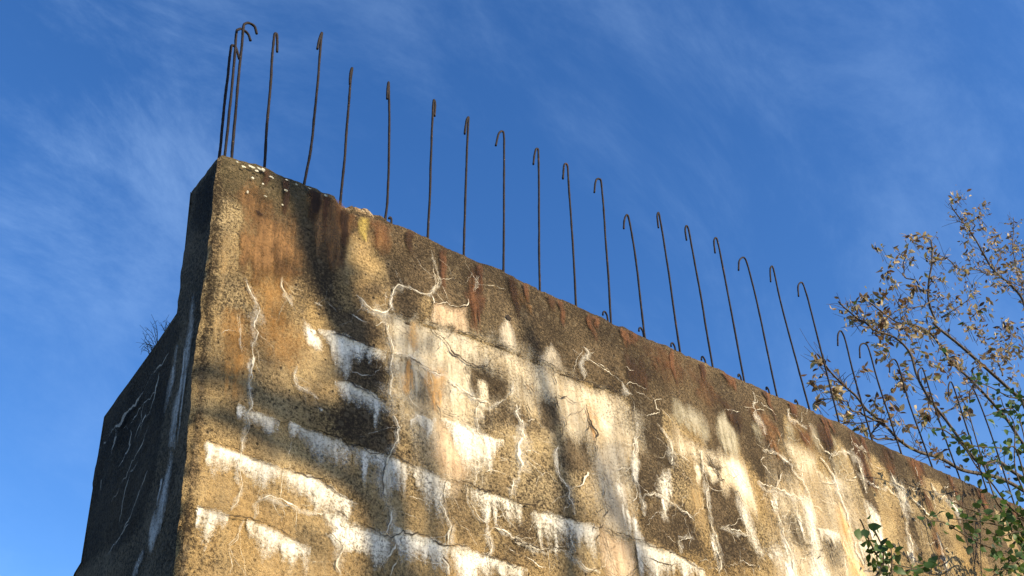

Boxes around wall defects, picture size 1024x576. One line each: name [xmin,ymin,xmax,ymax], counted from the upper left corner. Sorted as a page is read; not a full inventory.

corrosion [239,167,302,287]
corrosion [309,189,352,266]
crack [100,354,168,551]
damp [196,507,229,535]
damp [306,325,381,369]
damp [206,442,522,576]
damp [362,305,704,576]
crack [225,252,961,576]
corrosion [620,328,650,388]
damp [675,406,797,576]
corrosion [788,401,835,451]
damp [798,499,890,576]